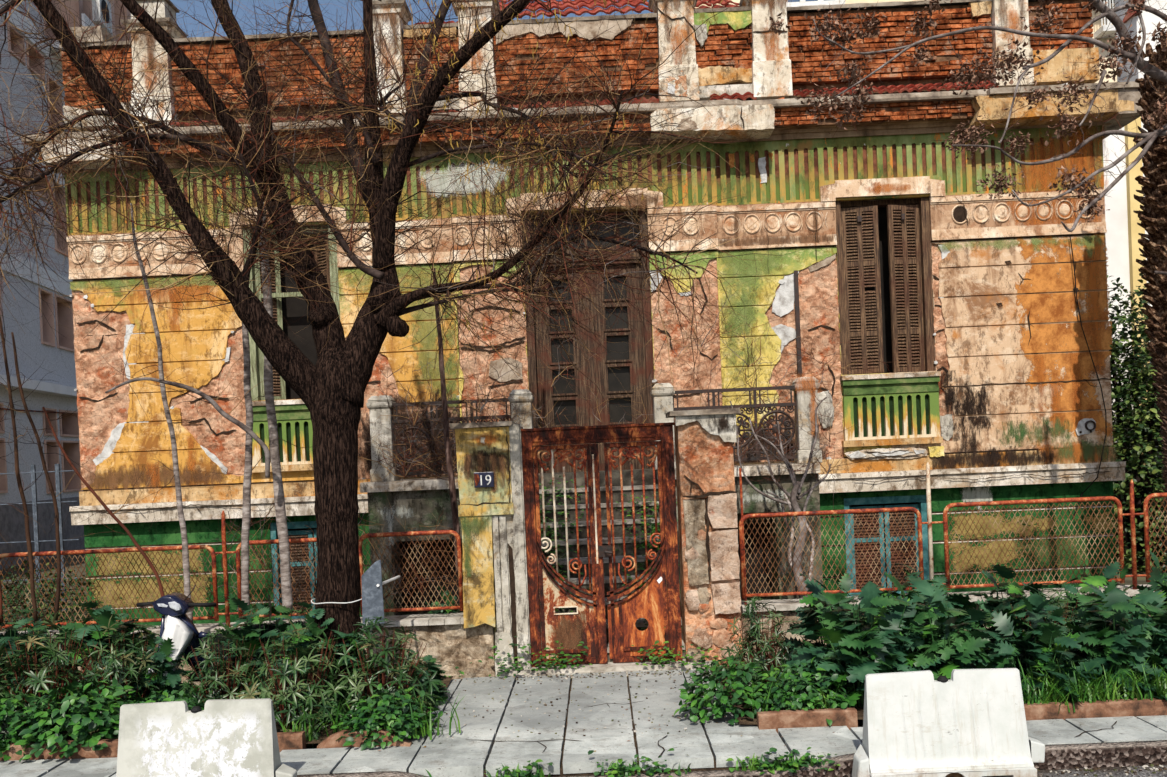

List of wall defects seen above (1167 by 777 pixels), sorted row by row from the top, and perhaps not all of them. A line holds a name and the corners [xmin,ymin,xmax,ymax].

peeling [419,160,509,197]
spalling [70,290,149,488]
spalling [170,327,253,476]
spalling [650,259,723,408]
spalling [733,253,927,463]
leakage [932,370,1057,469]